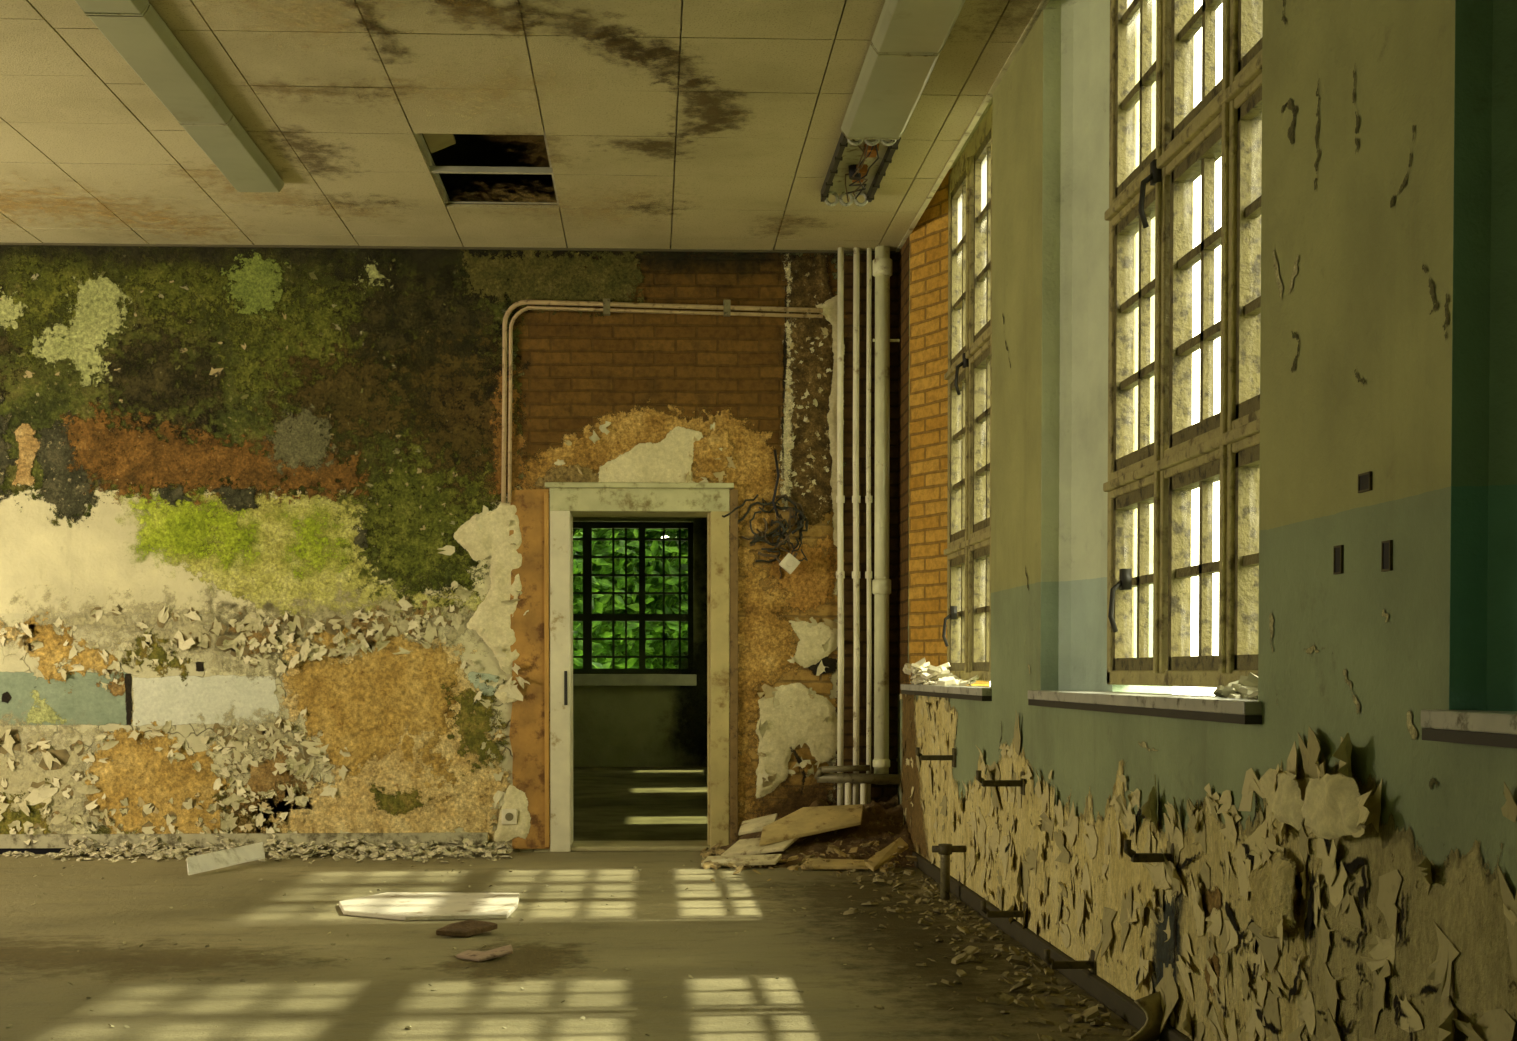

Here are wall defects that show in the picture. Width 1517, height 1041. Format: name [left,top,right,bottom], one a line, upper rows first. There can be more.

damp [346,2,407,55]
damp [435,0,745,159]
damp [34,410,101,522]
damp [158,485,262,571]
damp [278,507,370,581]
flaking render [0,236,1517,1041]